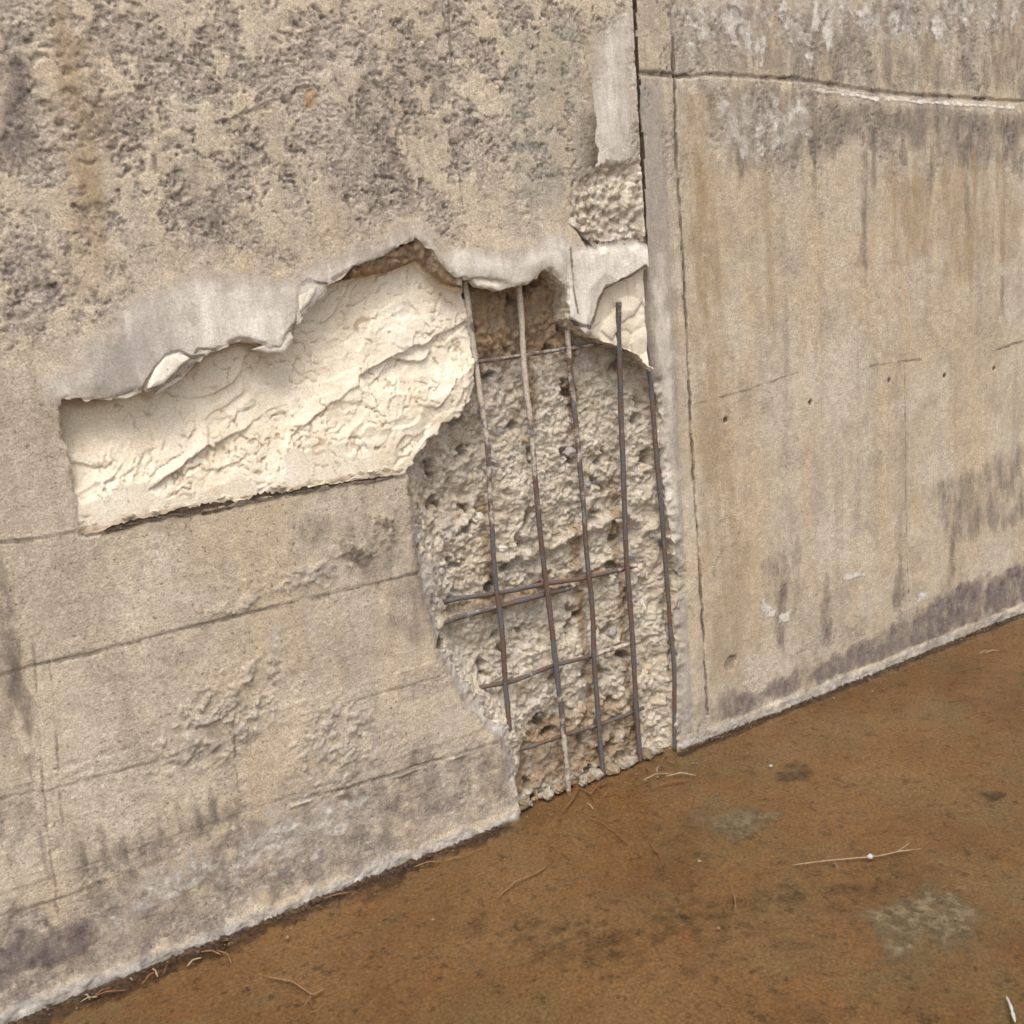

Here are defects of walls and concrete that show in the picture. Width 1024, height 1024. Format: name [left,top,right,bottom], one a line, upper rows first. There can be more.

damp [639,86,665,218]
crack [764,77,1015,109]
rust [329,241,575,416]
spalling [51,19,679,800]
crack [33,648,100,686]
crack [131,602,291,644]
rust [552,539,619,693]
damp [676,567,1024,752]
crack [41,735,63,829]
damp [232,797,367,867]
rust [515,698,636,792]
damp [0,809,520,1024]